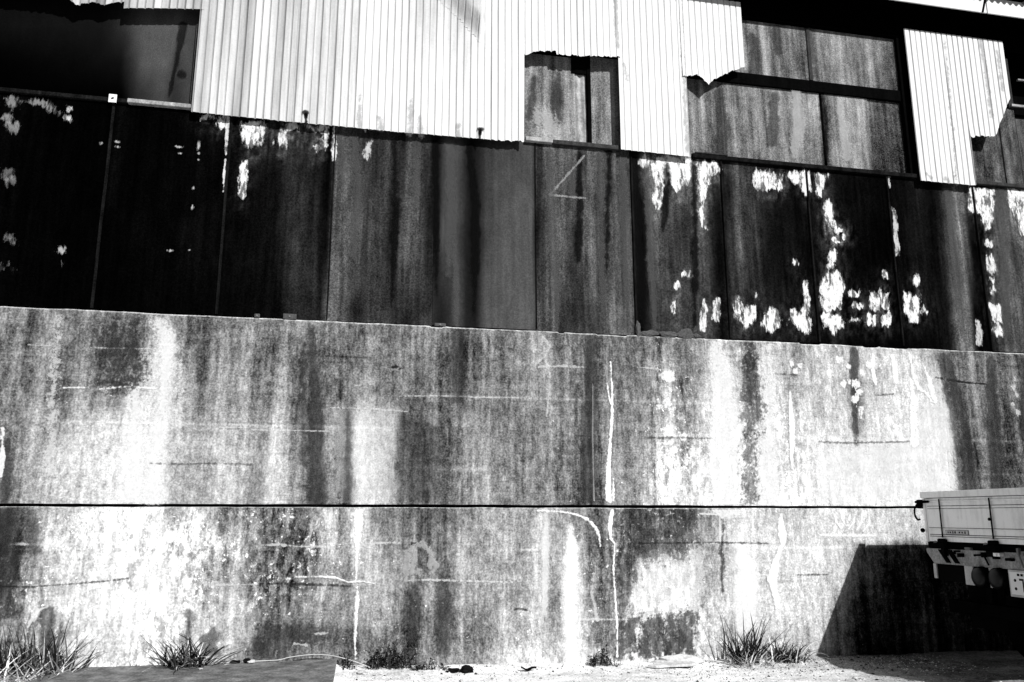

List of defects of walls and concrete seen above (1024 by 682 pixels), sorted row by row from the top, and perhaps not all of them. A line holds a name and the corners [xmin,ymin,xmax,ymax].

peeling [200,114,337,200]
peeling [638,153,720,229]
peeling [699,297,721,332]
peeling [734,169,928,336]
peeling [968,187,1024,345]
leakage [99,318,184,504]
leakage [299,328,325,504]
crack [258,509,374,659]
leakage [343,411,352,502]
crack [537,361,618,658]
leakage [706,341,795,638]
leakage [849,348,877,445]